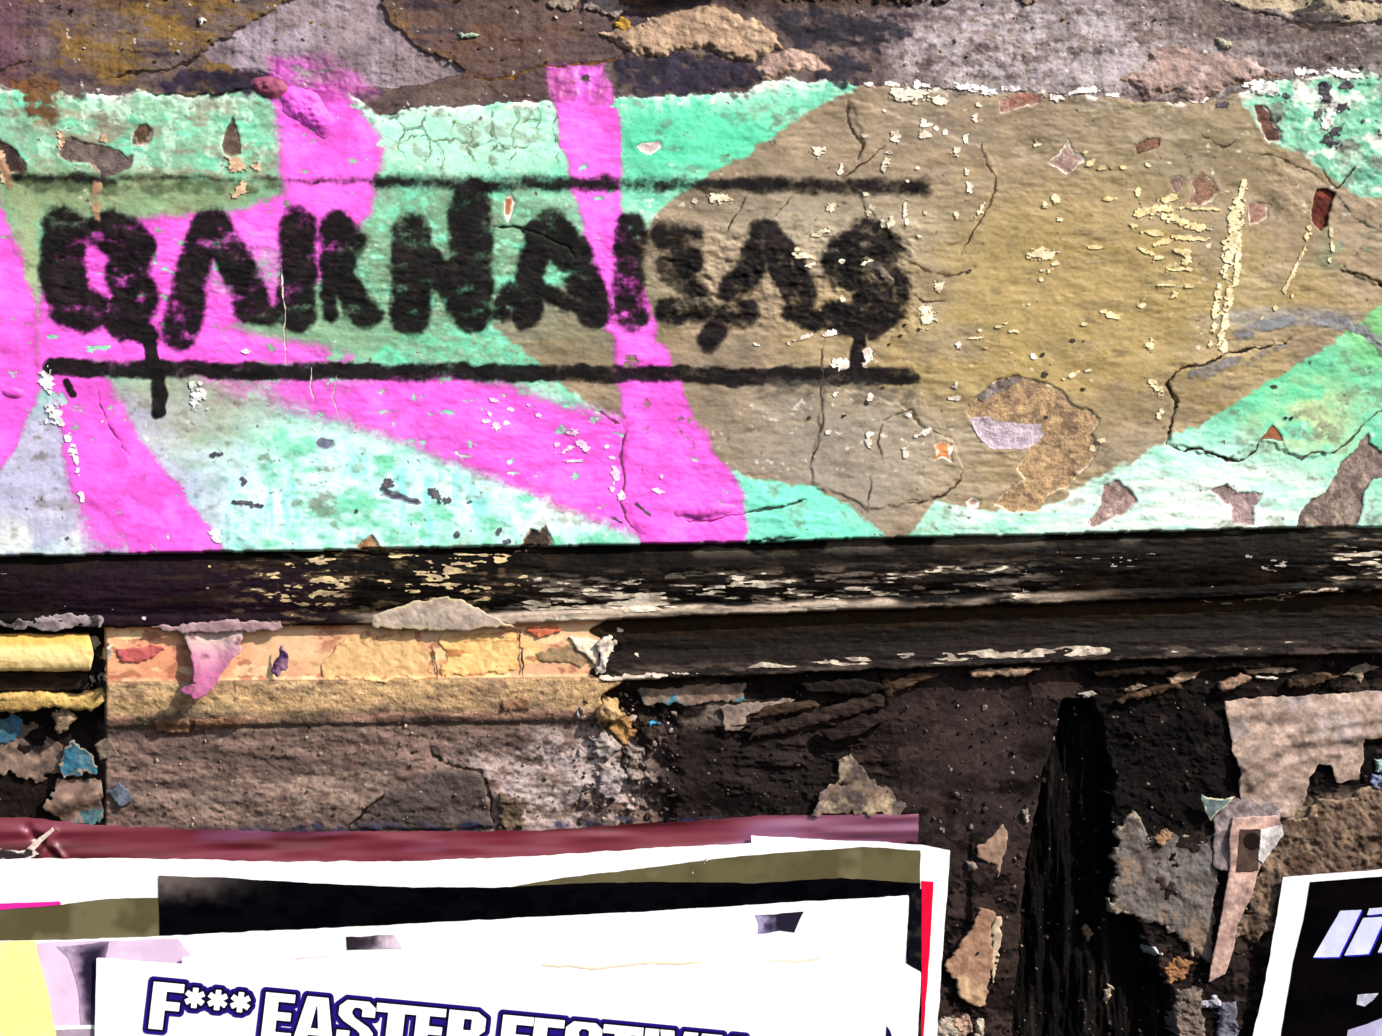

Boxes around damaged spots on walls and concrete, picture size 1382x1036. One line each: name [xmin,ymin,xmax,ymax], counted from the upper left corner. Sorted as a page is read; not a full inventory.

spalling [202,0,465,89]
peeling [57,124,152,177]
spalling [863,46,1382,222]
crack [1201,133,1376,229]
spalling [830,280,945,371]
crack [1348,271,1382,287]
spalling [948,352,1105,512]
crack [1165,339,1382,462]
spalling [1089,480,1137,527]
spalling [1296,434,1382,592]
peeling [0,526,1033,699]
spalling [934,646,1110,664]